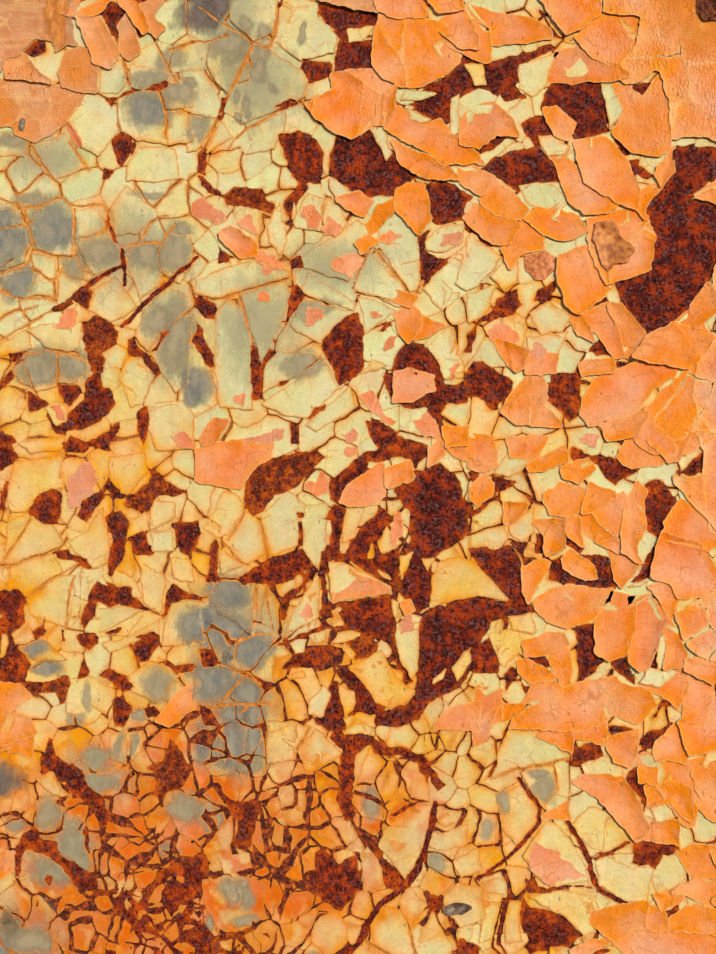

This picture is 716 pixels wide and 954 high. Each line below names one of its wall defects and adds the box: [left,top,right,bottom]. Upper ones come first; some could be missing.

corrosion [0,0,181,243]
peeling [0,31,253,180]
crack [0,0,314,392]
peeling [440,205,588,291]
crack [459,201,632,348]
corrosion [0,250,310,954]
corrosion [169,0,716,954]
crack [471,501,577,563]
crack [0,586,628,954]
peeling [496,764,572,845]
peeling [370,904,415,954]
peeling [589,879,716,954]